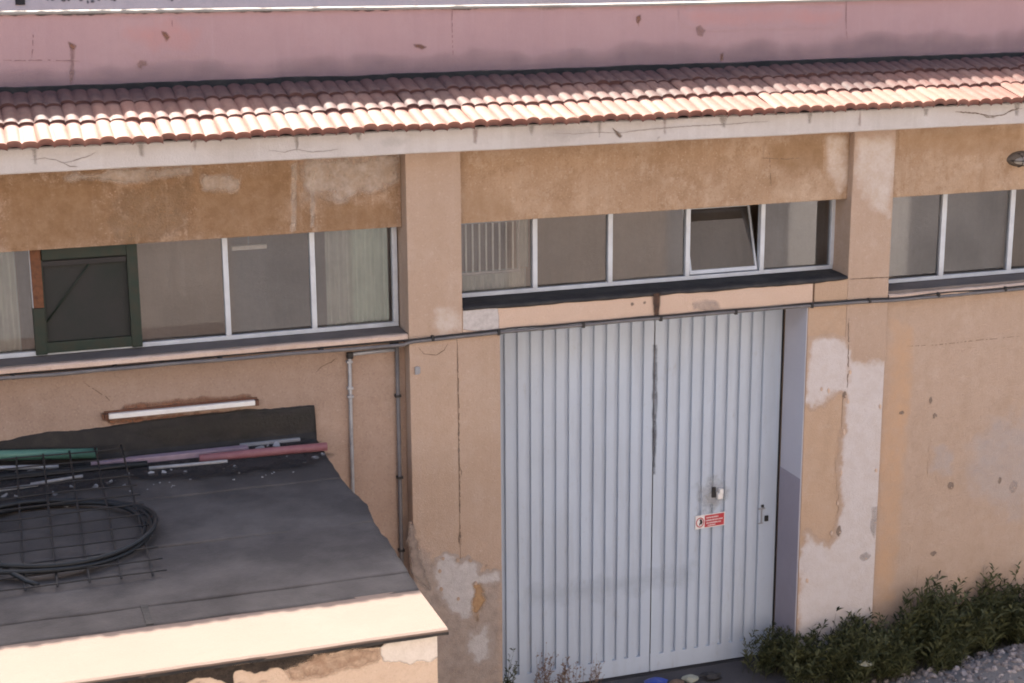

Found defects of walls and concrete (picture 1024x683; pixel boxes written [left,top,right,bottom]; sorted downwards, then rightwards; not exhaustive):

crack [32,152,96,167]
crack [418,344,462,538]
peeling [797,333,885,653]
spalling [117,636,438,683]
peeling [433,551,502,667]